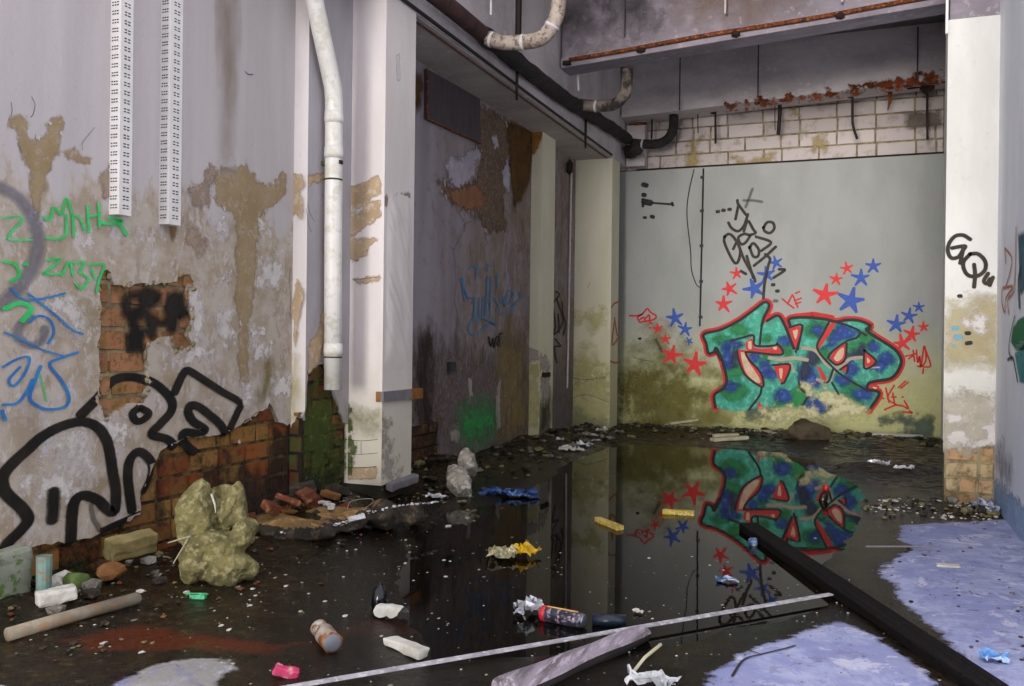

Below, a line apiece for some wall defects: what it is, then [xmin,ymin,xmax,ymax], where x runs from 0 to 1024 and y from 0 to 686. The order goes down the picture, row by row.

corrosion [724,69,945,112]
peeling [8,114,90,214]
peeling [99,165,110,200]
peeling [350,175,388,260]
peeling [436,104,511,234]
peeling [185,161,325,387]
flaking render [32,271,396,576]
damp [746,406,773,421]
damp [879,413,934,437]